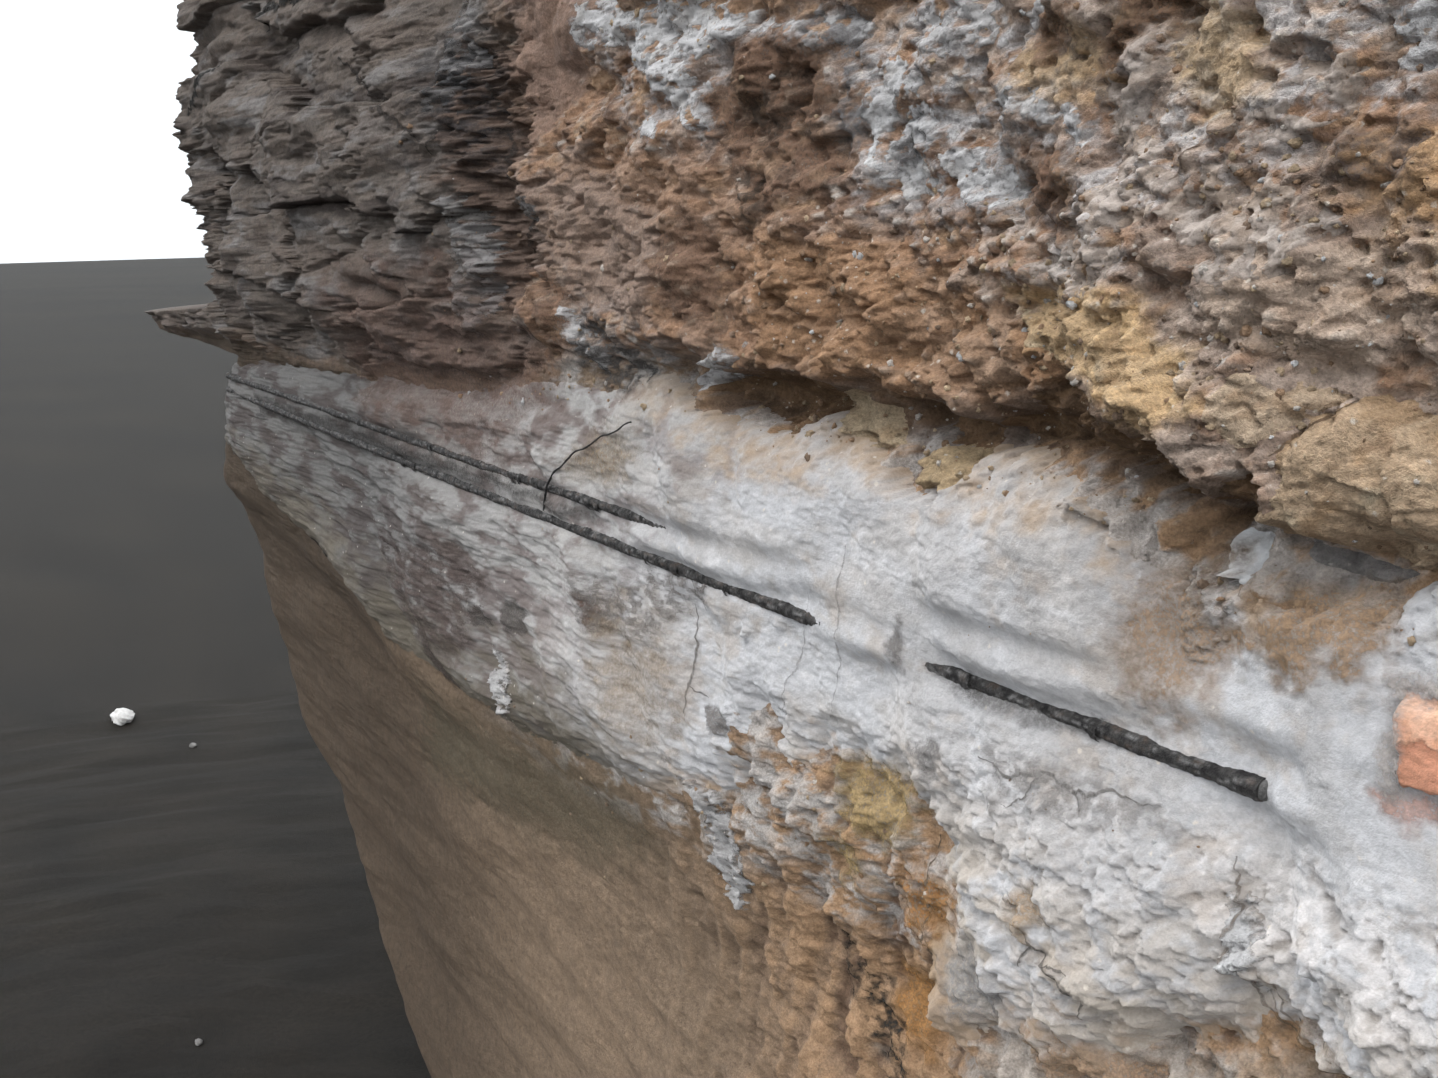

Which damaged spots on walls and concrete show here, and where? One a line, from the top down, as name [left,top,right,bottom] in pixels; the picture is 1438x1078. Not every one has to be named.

spalling [1096,0,1208,76]
spalling [693,4,852,210]
spalling [643,211,741,337]
spalling [705,371,854,434]
spalling [952,382,1261,512]
crack [1269,400,1359,456]
leakage [682,779,755,910]
leakage [842,929,907,1078]
crack [919,834,941,961]
leakage [944,946,999,1015]
crack [1013,921,1083,1020]
crack [1215,856,1300,1034]